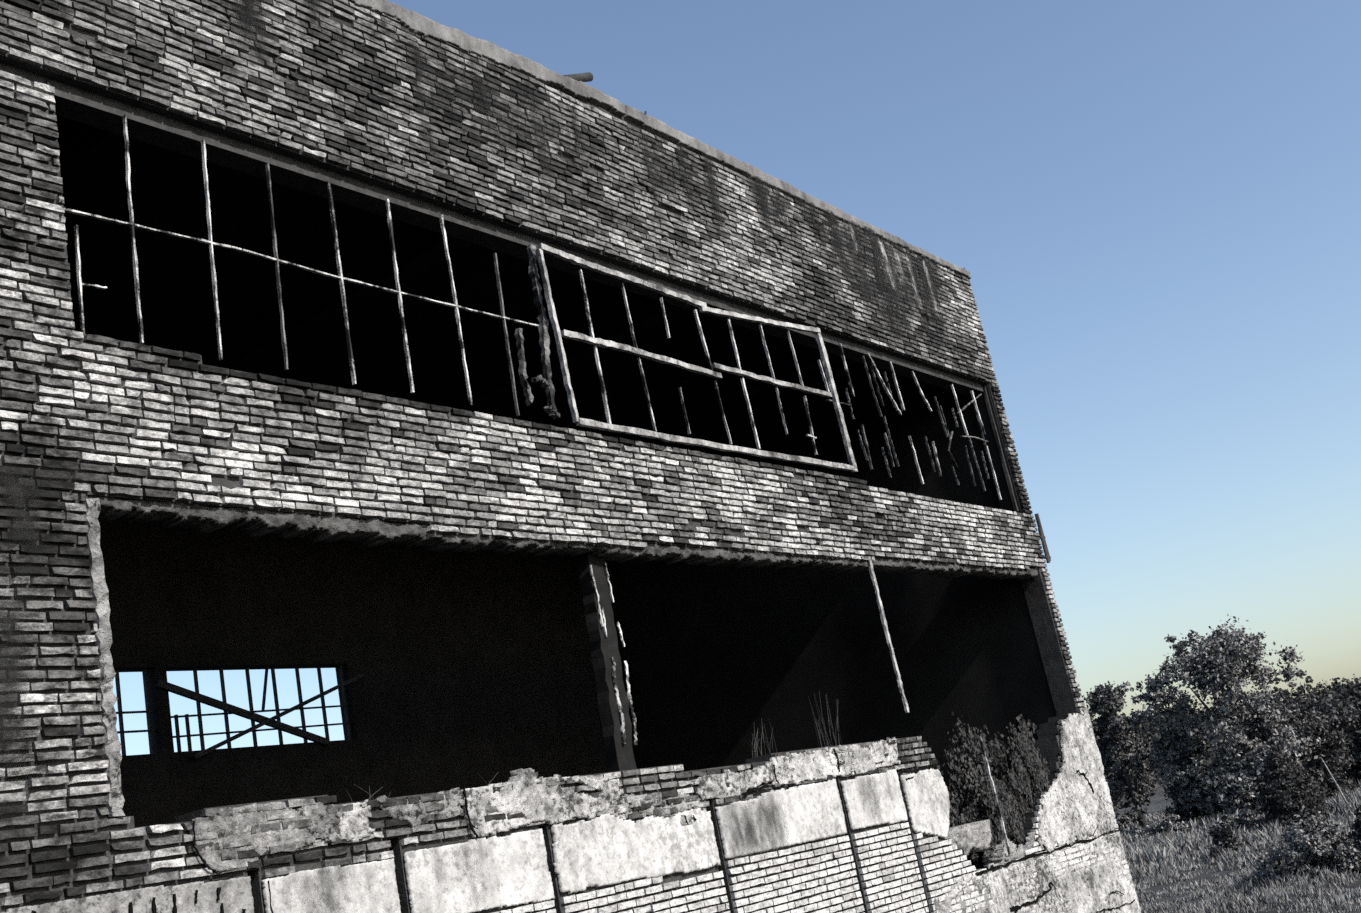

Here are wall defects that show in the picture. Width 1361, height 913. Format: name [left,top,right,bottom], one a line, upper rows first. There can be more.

flaking render [189,737,901,872]
flaking render [931,707,1117,913]
crack [1076,770,1094,794]
crack [976,826,1120,913]
crack [1096,890,1135,913]